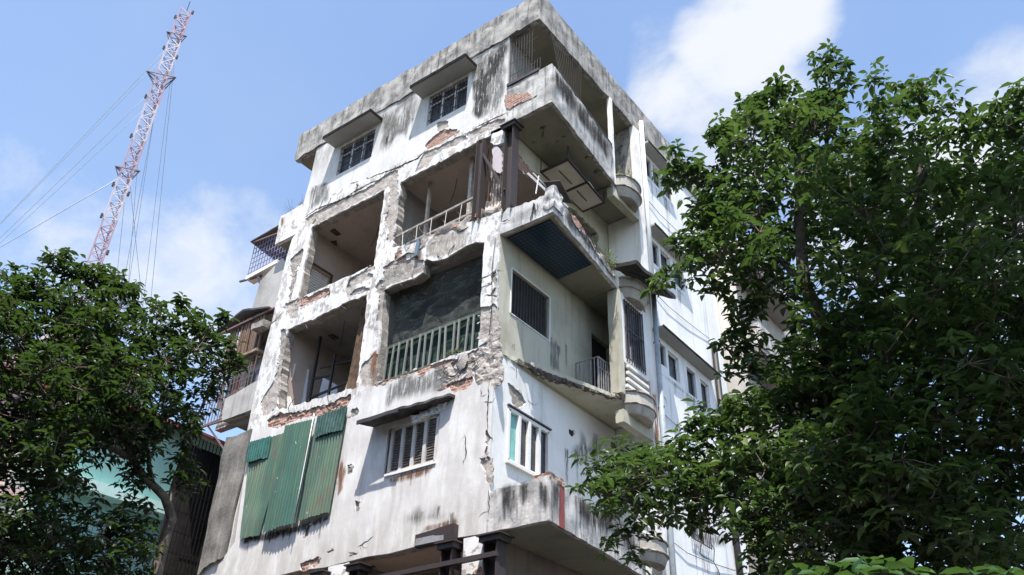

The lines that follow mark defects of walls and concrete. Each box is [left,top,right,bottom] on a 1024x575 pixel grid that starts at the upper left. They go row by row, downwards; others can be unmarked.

damp [473,44,507,117]
flaking render [416,91,531,172]
flaking render [306,170,455,322]
flaking render [261,249,359,429]
flaking render [358,270,525,409]
crack [440,356,495,462]
spalling [517,359,622,401]
flaking render [301,548,334,572]
flaking render [480,431,494,486]
damp [502,483,527,514]
damp [540,482,559,504]
damp [575,499,635,548]